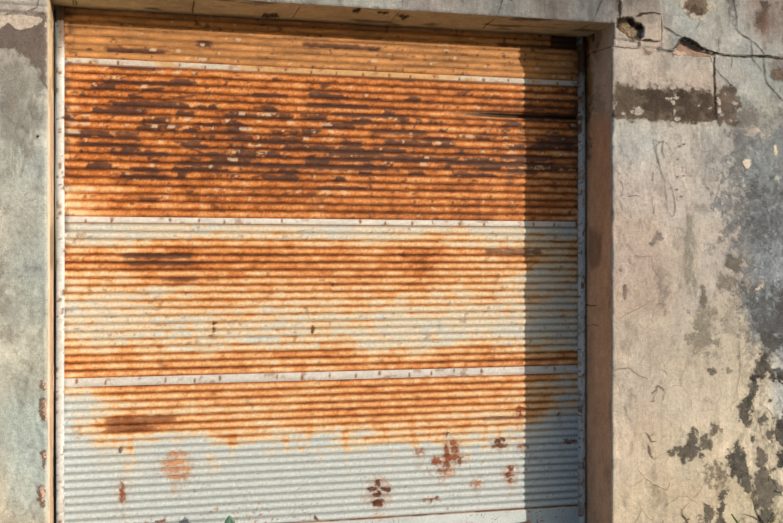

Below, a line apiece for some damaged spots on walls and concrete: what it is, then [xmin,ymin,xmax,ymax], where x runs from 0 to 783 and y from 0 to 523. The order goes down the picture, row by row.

spalling [616,16,646,41]
crack [580,0,699,58]
spalling [671,36,745,82]
crack [708,0,783,115]
leakage [771,56,783,80]
leakage [612,82,783,523]
rust [432,432,464,476]
rust [367,479,391,507]